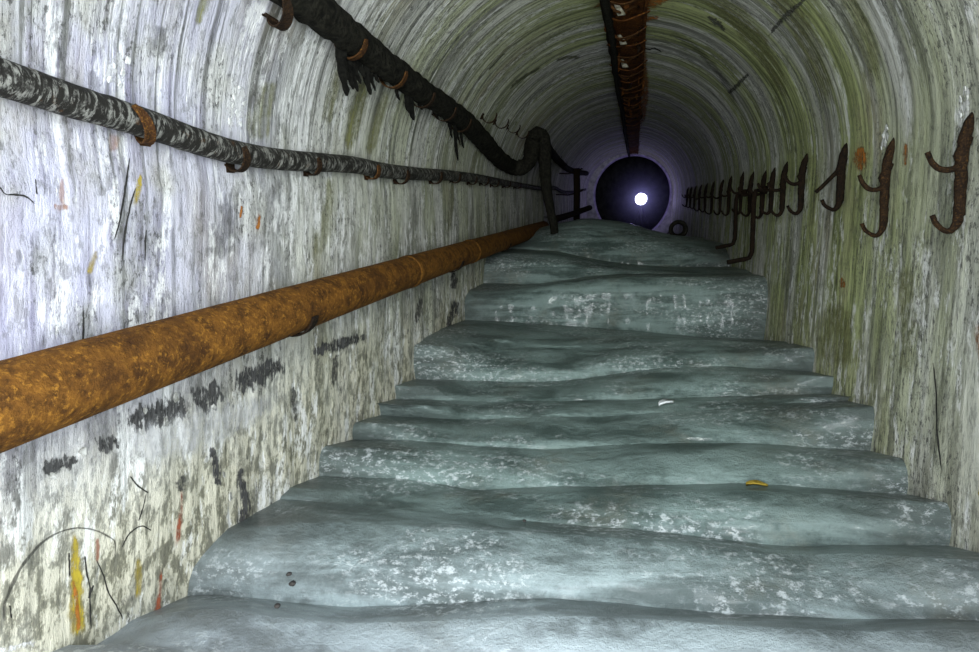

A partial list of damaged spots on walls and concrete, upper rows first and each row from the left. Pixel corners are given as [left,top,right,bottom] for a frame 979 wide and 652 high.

water stain [70,537,85,634]